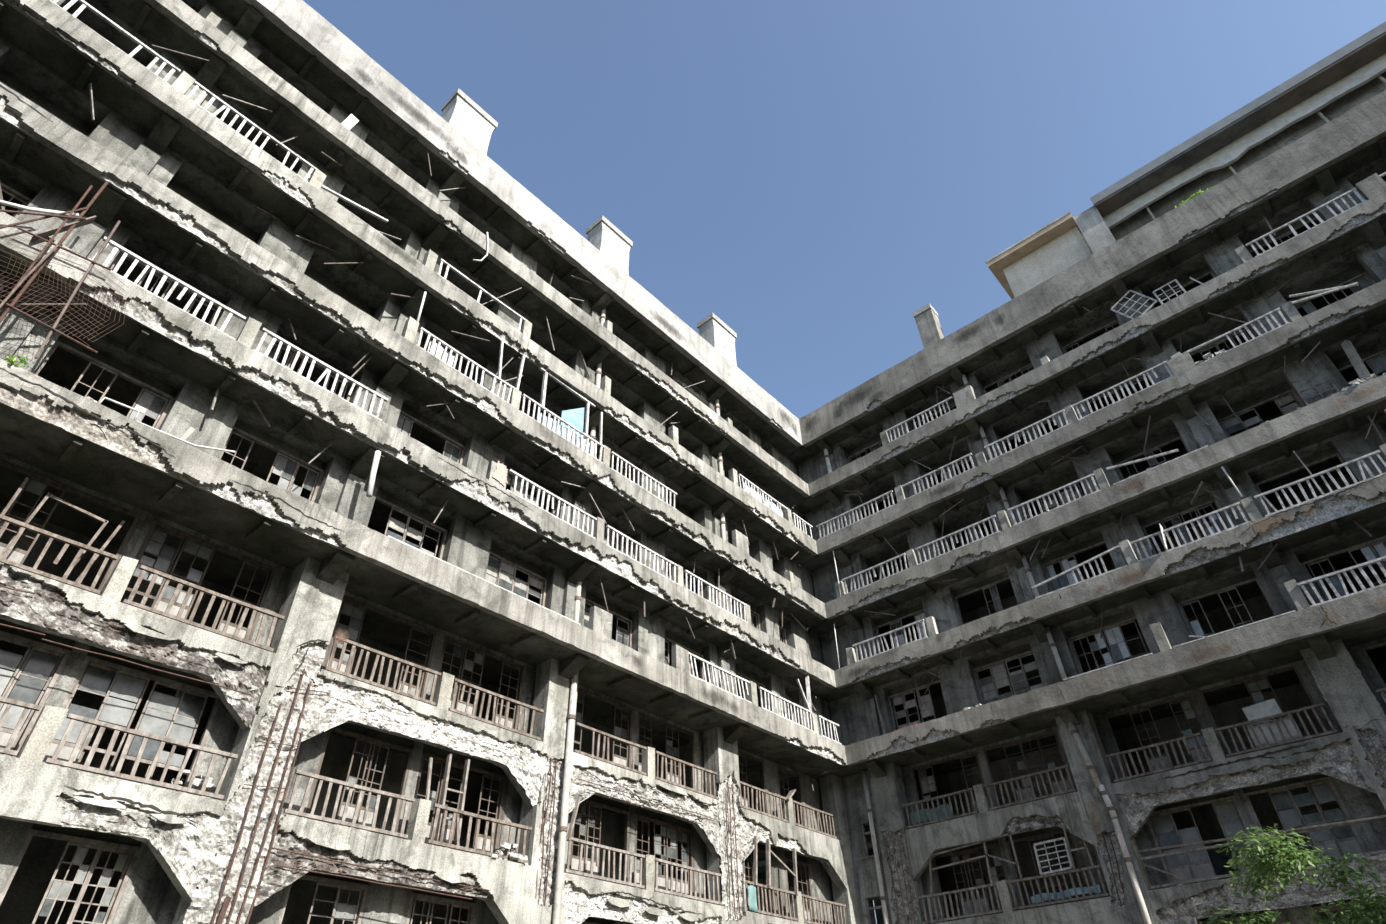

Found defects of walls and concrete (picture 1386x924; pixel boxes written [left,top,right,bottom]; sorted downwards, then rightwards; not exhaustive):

crack [1241,473,1386,535]
spalling [0,566,806,924]
spalling [1097,663,1386,906]
spalling [1156,859,1386,924]